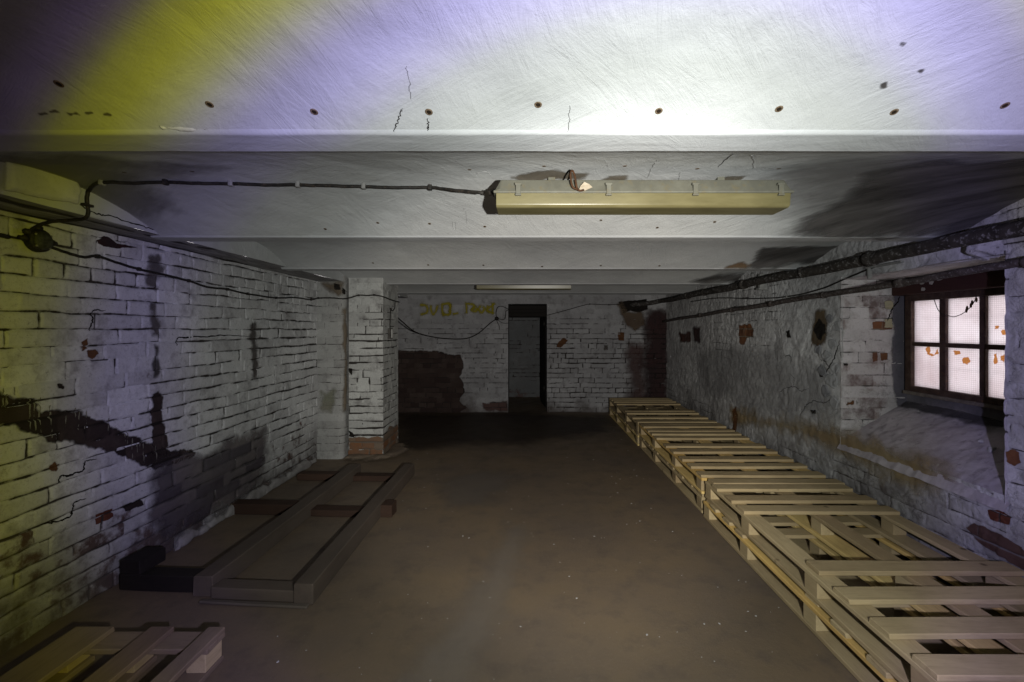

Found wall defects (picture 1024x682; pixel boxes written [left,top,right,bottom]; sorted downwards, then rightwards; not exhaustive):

damp [146,254,164,287]
damp [150,303,160,377]
flaking render [739,324,754,345]
spalling [813,319,826,340]
flaking render [348,350,466,455]
crack [40,459,96,525]
flaking render [967,510,1024,570]